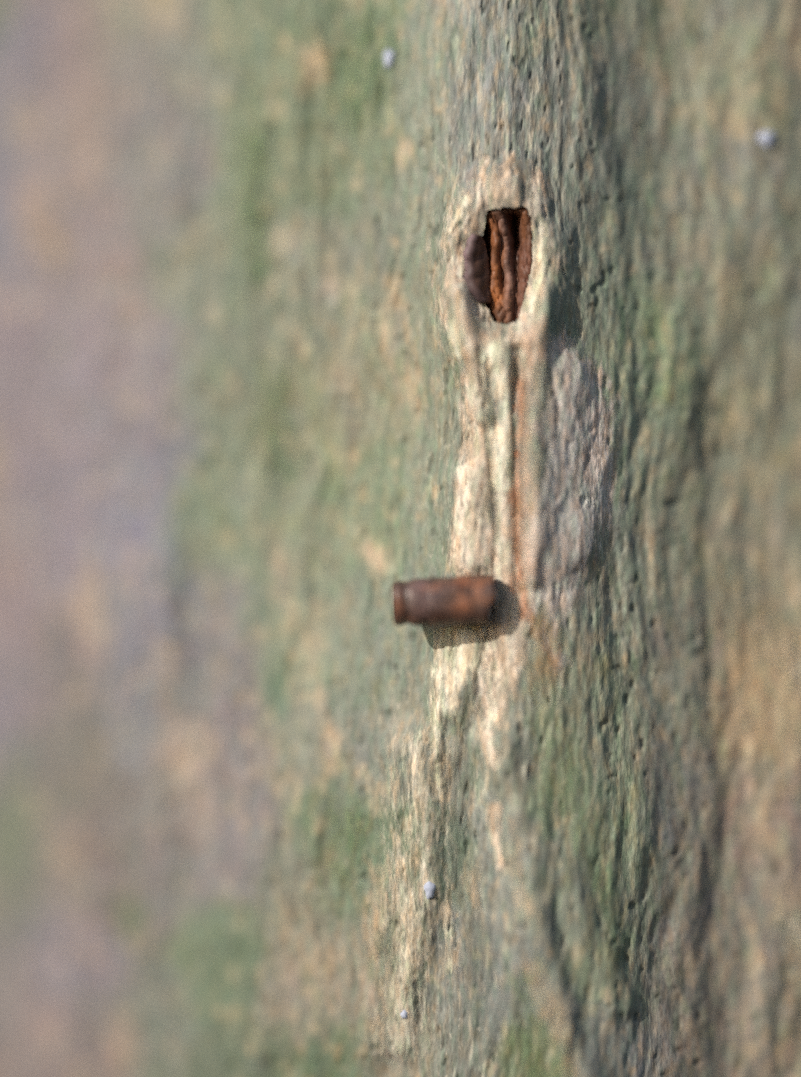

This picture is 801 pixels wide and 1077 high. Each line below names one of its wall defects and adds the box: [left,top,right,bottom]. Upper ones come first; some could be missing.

peeling [380,152,615,1051]
corrosion [509,382,527,618]